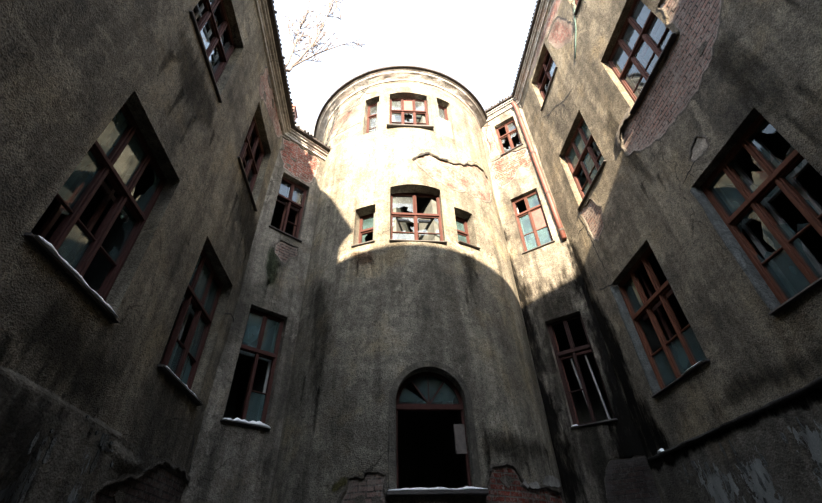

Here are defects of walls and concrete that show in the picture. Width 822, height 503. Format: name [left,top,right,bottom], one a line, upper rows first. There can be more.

water stain [162,34,213,140]
flaking render [620,0,724,158]
flaking render [259,66,321,185]
flaking render [324,82,533,203]
flaking render [688,134,710,163]
water stain [485,230,822,503]
flaking render [93,457,190,503]
flaking render [337,469,392,503]
flaking render [443,461,564,503]
peeling [682,439,786,503]
peeling [780,416,822,488]